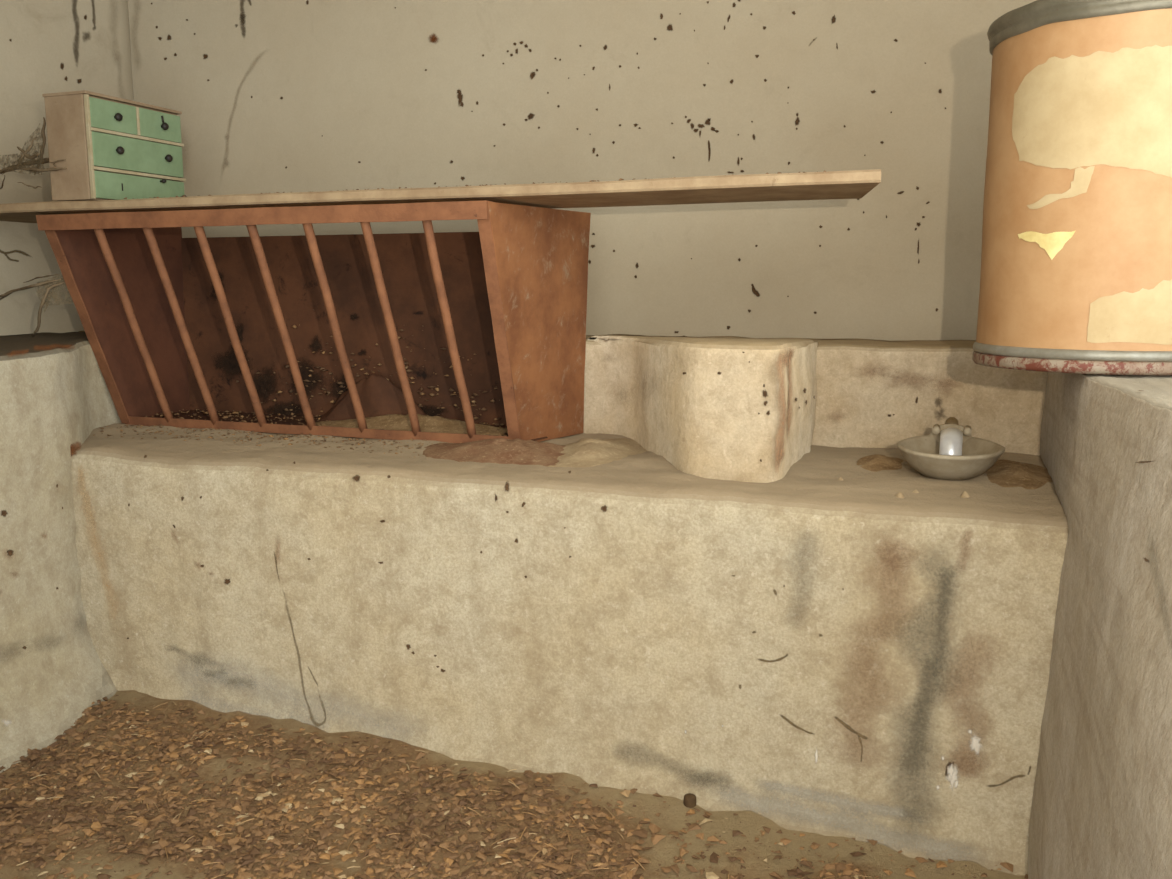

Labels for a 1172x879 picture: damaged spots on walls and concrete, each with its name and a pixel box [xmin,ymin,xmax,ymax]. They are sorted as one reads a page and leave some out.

corrosion [775,352,792,465]
crack [289,617,326,726]
water stain [937,757,958,790]